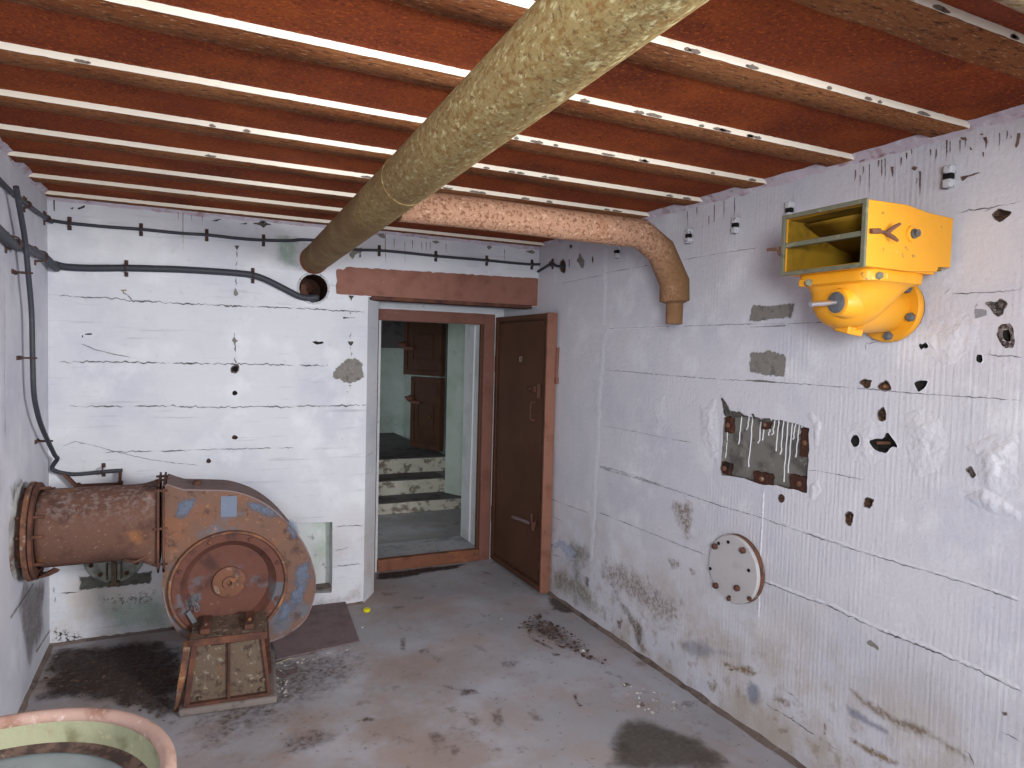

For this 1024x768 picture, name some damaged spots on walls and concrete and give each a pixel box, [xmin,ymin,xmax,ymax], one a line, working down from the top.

crack [61,252,366,356]
spalling [974,299,1015,348]
crack [60,334,319,367]
peeling [333,341,363,393]
spalling [859,379,892,392]
spalling [913,380,929,393]
crack [71,402,364,410]
peeling [721,398,771,422]
spalling [850,407,899,454]
spalling [845,511,854,526]
leakage [550,599,573,612]